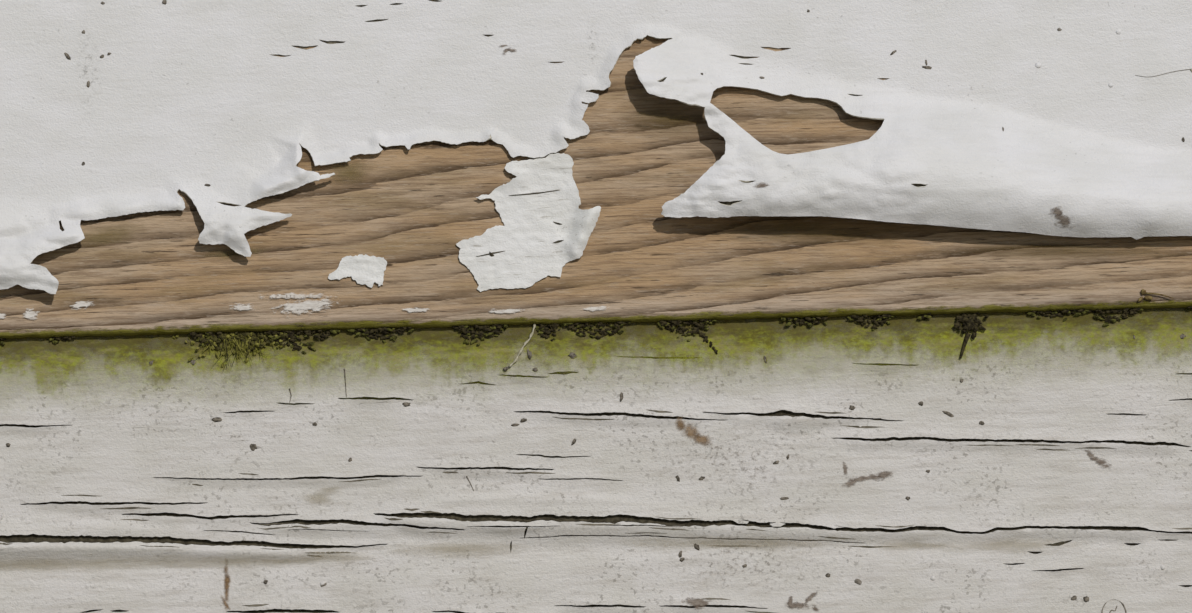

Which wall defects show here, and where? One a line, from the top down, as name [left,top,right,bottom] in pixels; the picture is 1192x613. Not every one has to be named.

peeling [0,24,1192,294]
crack [514,410,1192,451]
crack [0,454,1192,571]